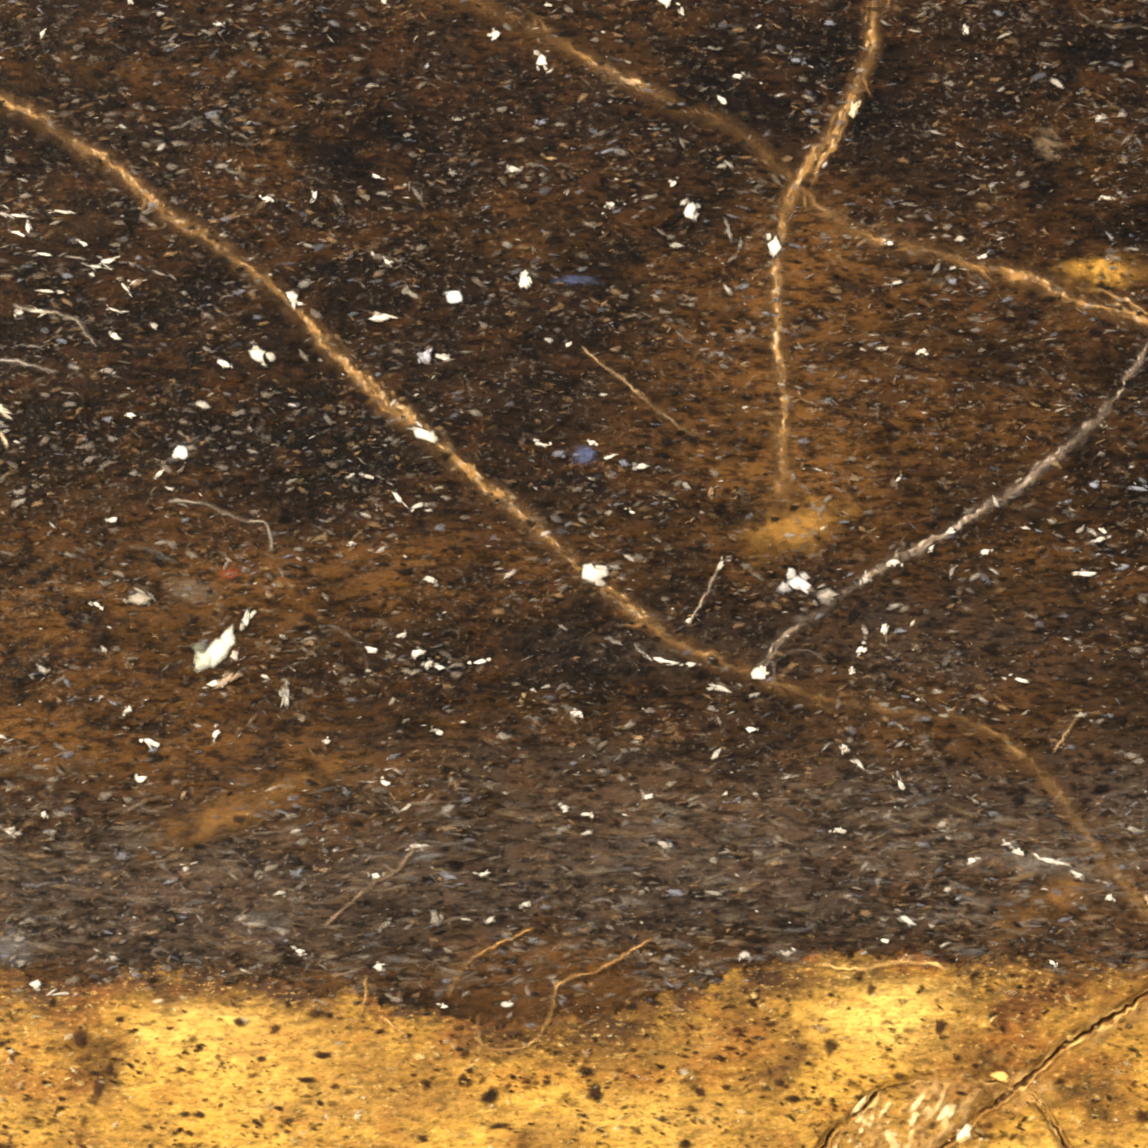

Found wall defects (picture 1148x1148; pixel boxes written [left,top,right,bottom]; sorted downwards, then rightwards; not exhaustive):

crack [543,27,649,93]
crack [768,0,890,493]
crack [0,94,715,658]
crack [847,231,1148,592]
crack [758,620,802,688]
crack [1090,840,1148,912]
crack [482,929,529,953]
crack [822,961,943,971]
crack [937,989,1148,1148]
crack [819,1078,925,1148]